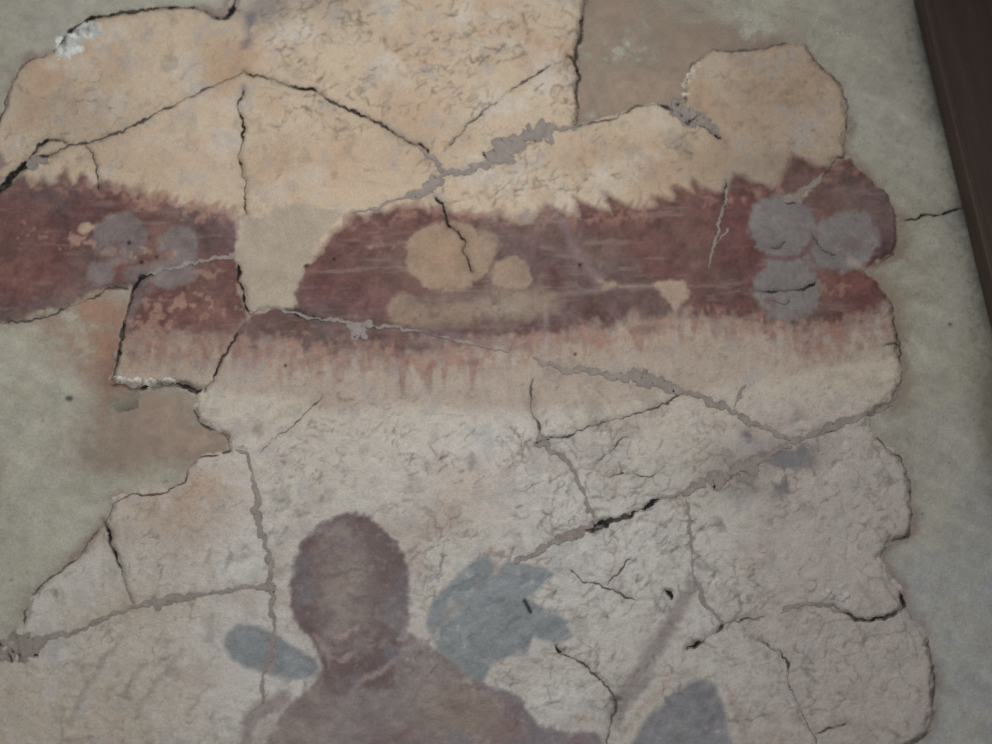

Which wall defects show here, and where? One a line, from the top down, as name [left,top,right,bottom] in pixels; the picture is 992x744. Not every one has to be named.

spalling [53,21,104,60]
crack [0,0,849,272]
crack [905,207,962,220]
crack [755,281,816,305]
crack [0,253,509,703]
crack [514,288,912,744]
crack [914,640,935,743]